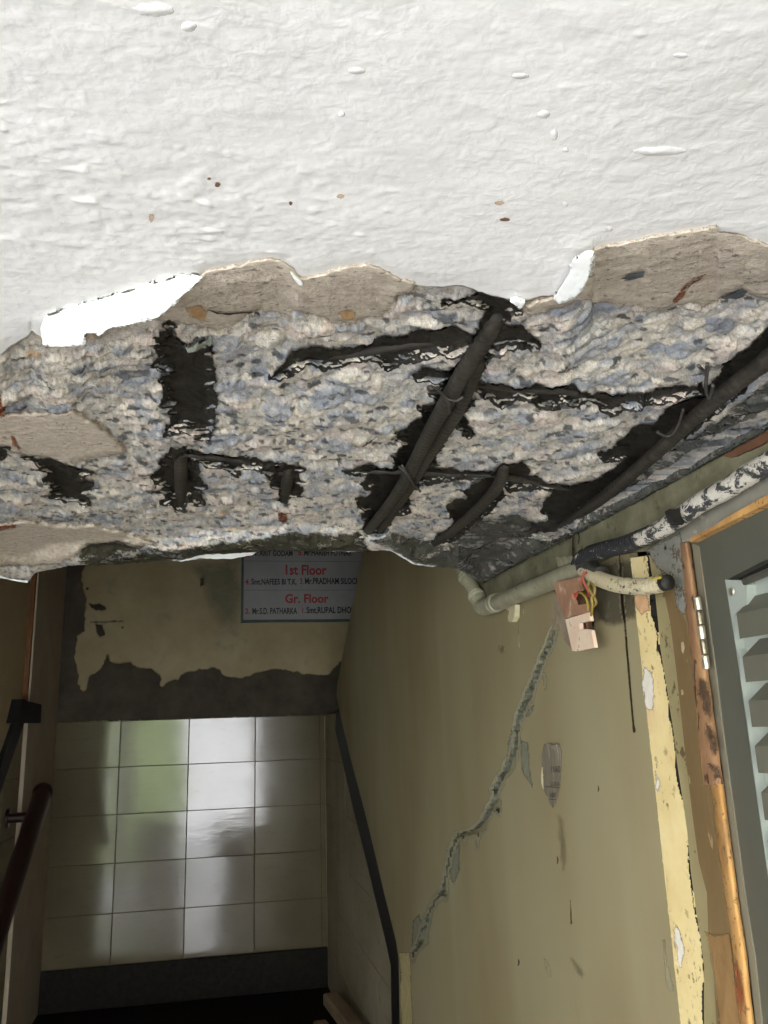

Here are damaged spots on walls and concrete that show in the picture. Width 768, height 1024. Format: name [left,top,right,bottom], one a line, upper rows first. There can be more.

spalling [0,225,768,723]
crack [405,625,558,964]
peeling [663,927,684,991]